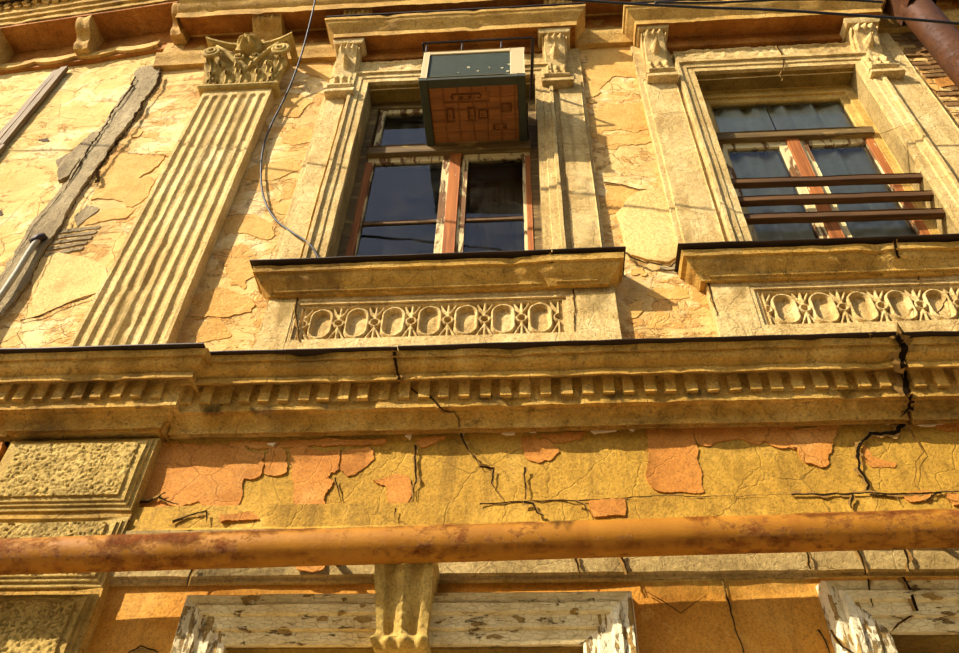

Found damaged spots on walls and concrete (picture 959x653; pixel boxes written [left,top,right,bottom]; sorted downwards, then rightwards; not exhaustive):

peeling [584,46,652,150]
flaking render [891,32,959,117]
flaking render [31,150,166,316]
crack [626,252,676,267]
crack [390,276,959,518]
peeling [140,438,387,523]
peeling [629,425,839,494]
rust [108,531,218,545]
crack [647,579,745,653]
crack [816,629,873,653]
peeling [828,594,896,653]
crack [889,549,919,634]